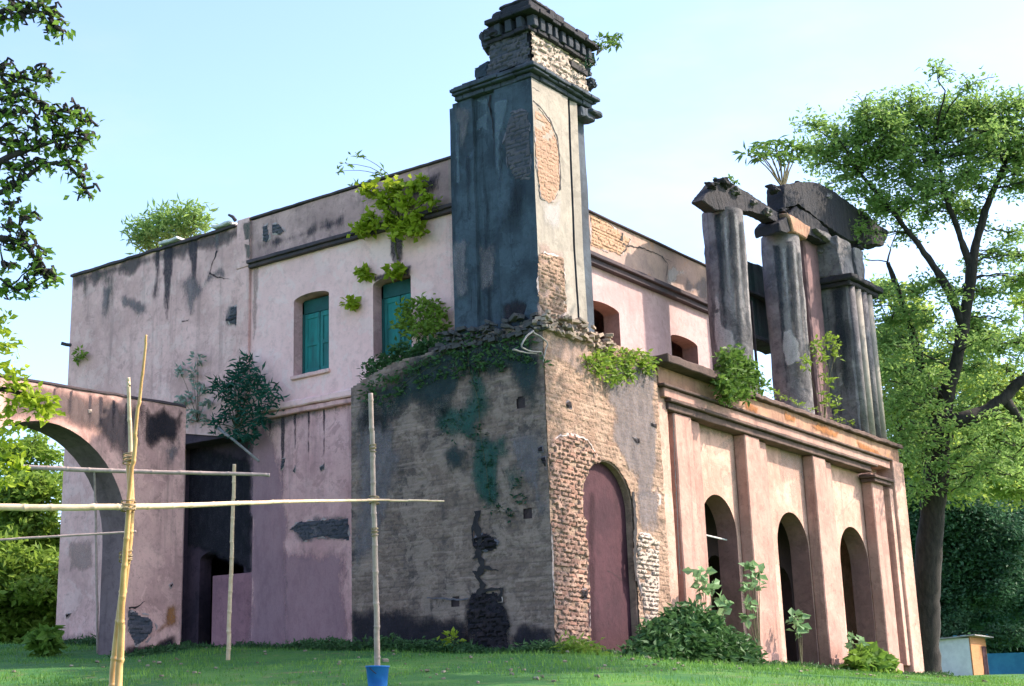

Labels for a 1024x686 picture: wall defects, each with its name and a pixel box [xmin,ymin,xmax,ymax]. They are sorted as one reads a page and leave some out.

spalling [477,99,560,203]
spalling [590,215,631,256]
water stain [98,271,113,314]
water stain [154,247,173,310]
water stain [183,240,224,311]
spalling [537,245,567,318]
water stain [10,388,182,461]
water stain [188,407,468,652]
spalling [538,433,601,643]
spalling [636,532,660,629]